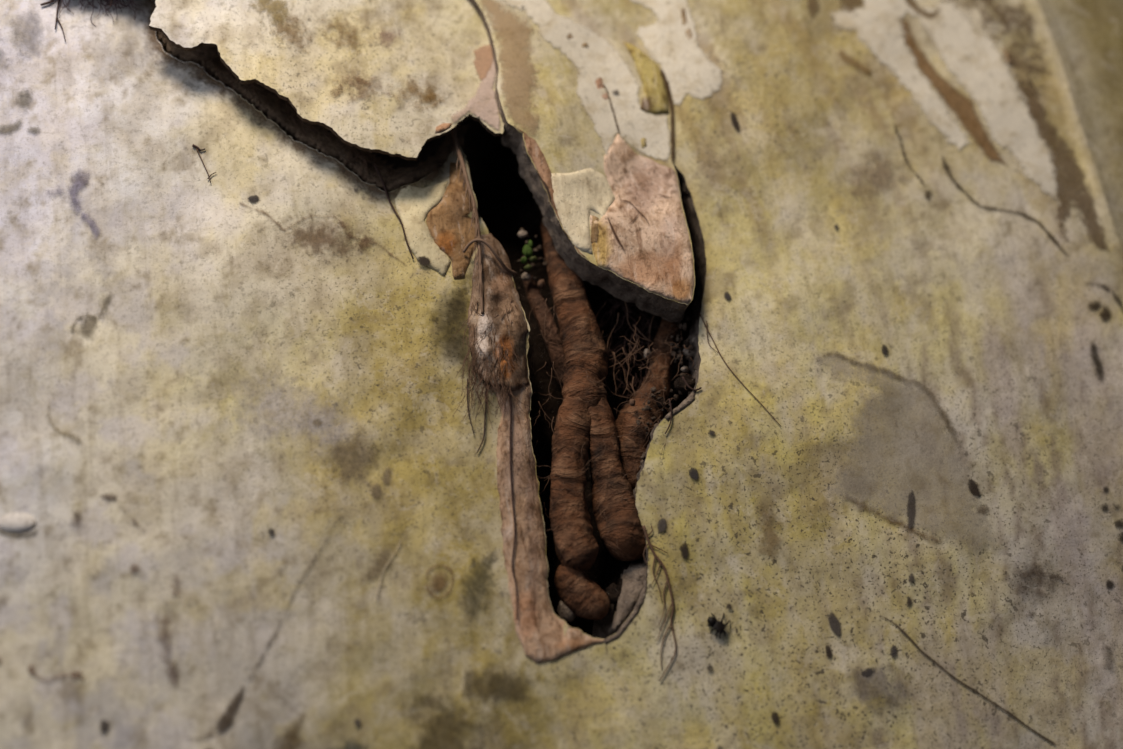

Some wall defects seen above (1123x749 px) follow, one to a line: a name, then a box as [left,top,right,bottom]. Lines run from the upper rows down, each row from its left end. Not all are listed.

crack [142,0,489,220]
peeling [831,0,1060,205]
spalling [149,0,722,663]